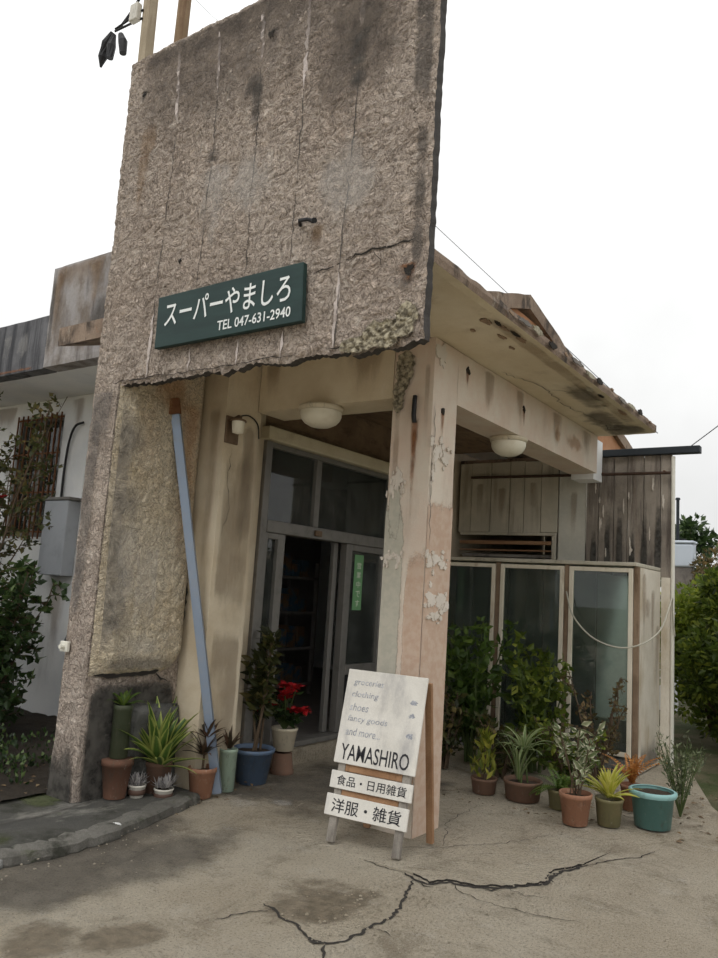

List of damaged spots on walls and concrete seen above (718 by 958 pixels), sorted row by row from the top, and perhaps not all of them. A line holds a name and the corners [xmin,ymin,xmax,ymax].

crack [289,0,311,262]
crack [315,0,419,349]
spalling [338,300,418,413]
peeling [385,466,406,499]
peeling [380,550,403,569]
peeling [423,549,449,624]
crack [314,865,588,944]